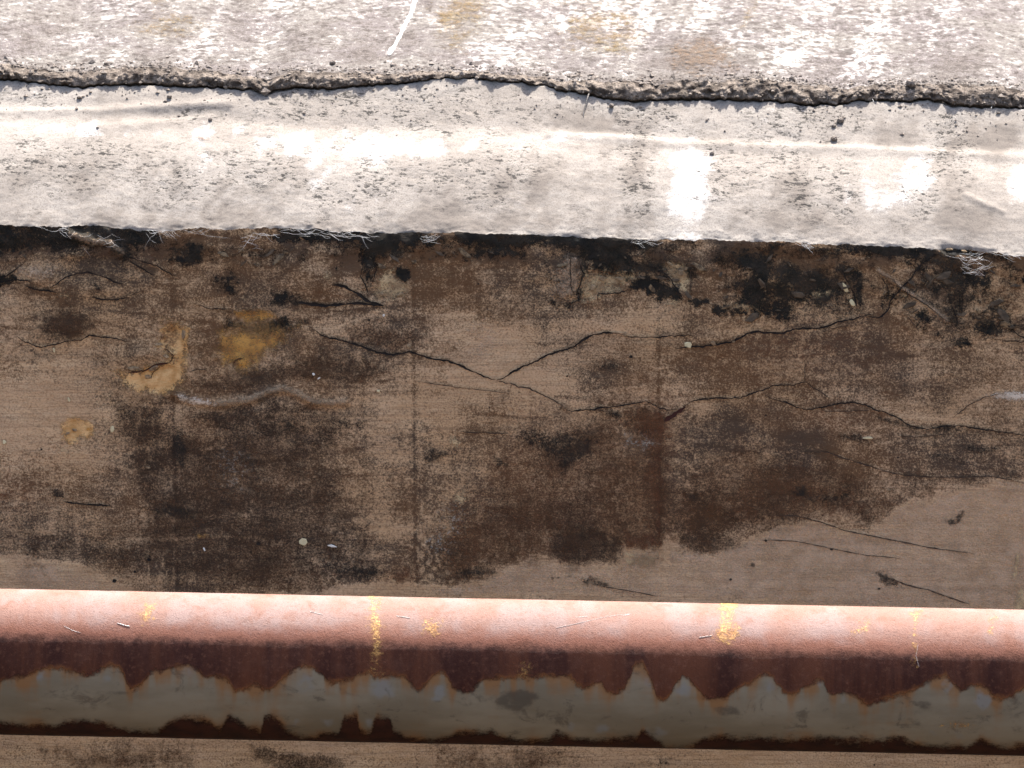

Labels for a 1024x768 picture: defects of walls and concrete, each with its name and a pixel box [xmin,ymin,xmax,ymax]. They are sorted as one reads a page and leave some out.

crack [0,257,177,300]
damp [0,225,1024,348]
crack [17,335,129,348]
crack [312,248,1023,438]
efflorescence [991,392,1024,400]
damp [87,349,382,593]
damp [423,406,880,586]
crack [814,451,1023,483]
crack [765,514,975,604]
rust [0,589,1024,706]
rust [0,714,1024,756]